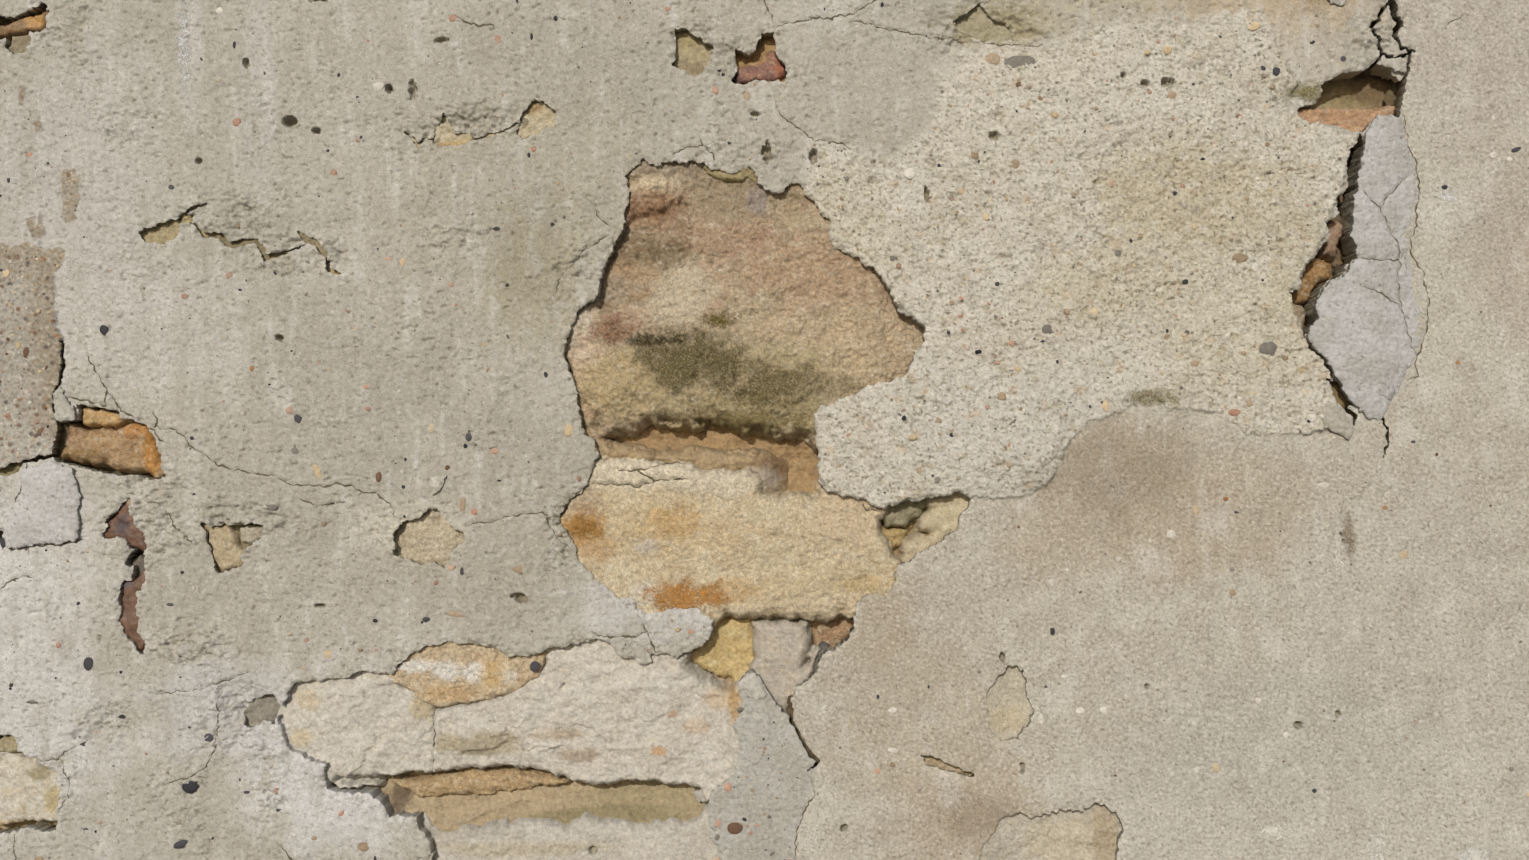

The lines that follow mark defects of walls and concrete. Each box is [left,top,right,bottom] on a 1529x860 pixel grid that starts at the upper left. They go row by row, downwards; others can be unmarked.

spalling [0,1,49,54]
spalling [672,28,714,77]
spalling [731,32,787,85]
peeling [1289,56,1425,441]
crack [1307,0,1430,458]
spalling [53,386,166,480]
spalling [102,498,147,655]
crack [1,340,396,588]
spalling [200,522,263,573]
spalling [243,139,974,860]
spalling [0,734,61,834]
crack [786,694,820,856]